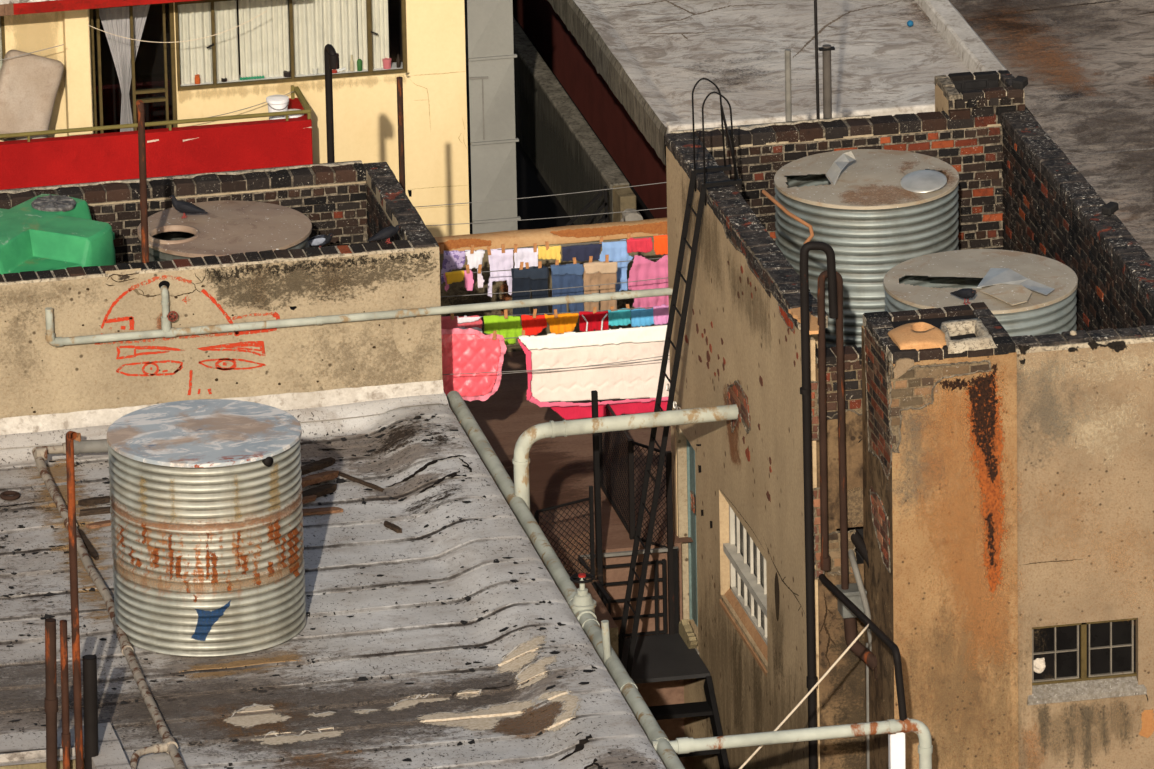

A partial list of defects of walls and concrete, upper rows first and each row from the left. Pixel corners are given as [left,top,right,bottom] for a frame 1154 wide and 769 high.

flaking render [685,309,760,462]
flaking render [811,326,992,480]
flaking render [813,487,891,580]
corrosion [940,364,1008,598]
peeling [224,703,344,745]
peeling [354,635,582,732]